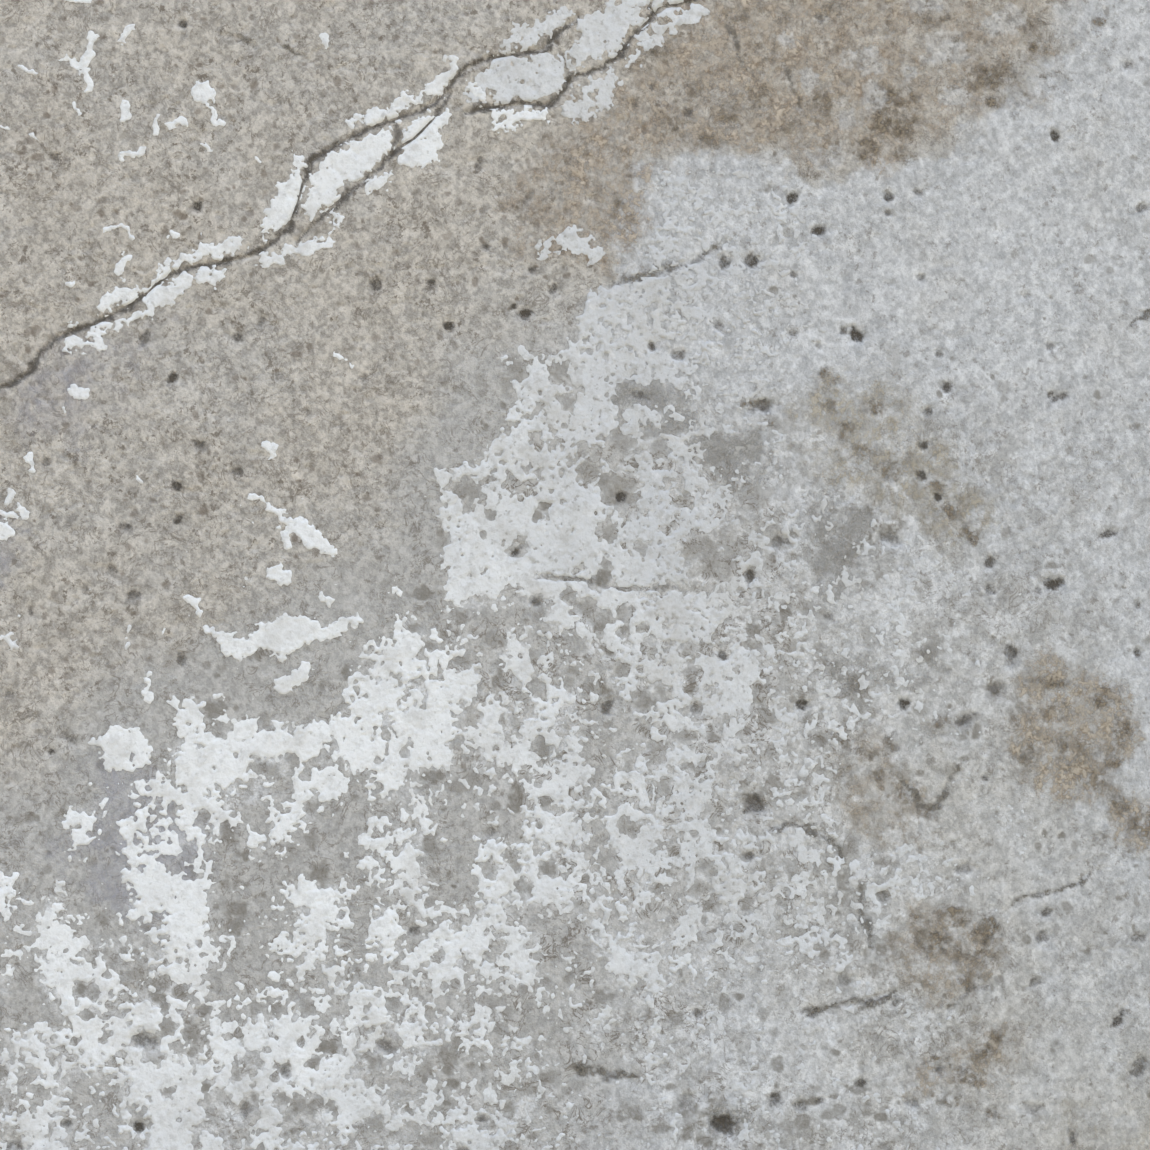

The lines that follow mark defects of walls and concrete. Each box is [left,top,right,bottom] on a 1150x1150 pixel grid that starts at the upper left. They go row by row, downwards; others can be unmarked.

crack [0,0,697,388]